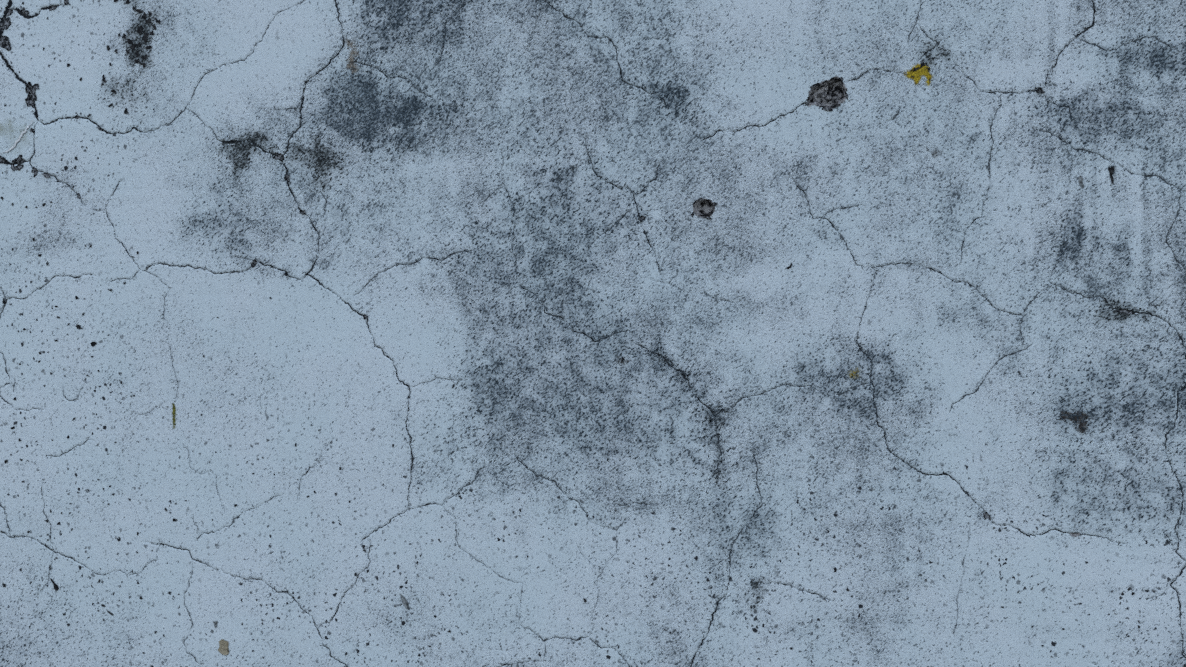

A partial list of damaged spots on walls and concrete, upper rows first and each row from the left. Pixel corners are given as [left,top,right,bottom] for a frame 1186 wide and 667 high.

water stain [182,0,555,269]
water stain [628,71,705,135]
spalling [691,198,718,220]
spalling [805,76,848,111]
water stain [1007,20,1186,174]
water stain [1048,204,1146,277]
crack [0,0,656,667]
water stain [398,103,814,611]
crack [484,0,1186,667]
water stain [774,331,929,430]
water stain [1016,295,1186,550]